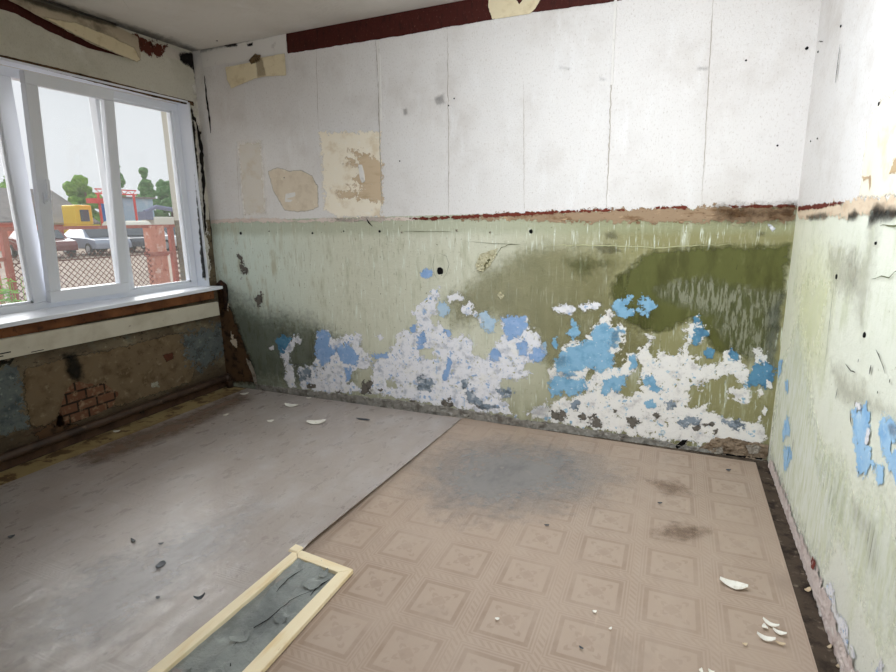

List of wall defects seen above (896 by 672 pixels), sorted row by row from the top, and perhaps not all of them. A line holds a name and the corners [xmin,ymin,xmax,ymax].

spalling [190,81,211,281]
peeling [268,128,385,221]
damp [611,244,791,365]
peeling [0,286,859,672]
damp [770,321,896,643]
peeling [851,400,896,485]